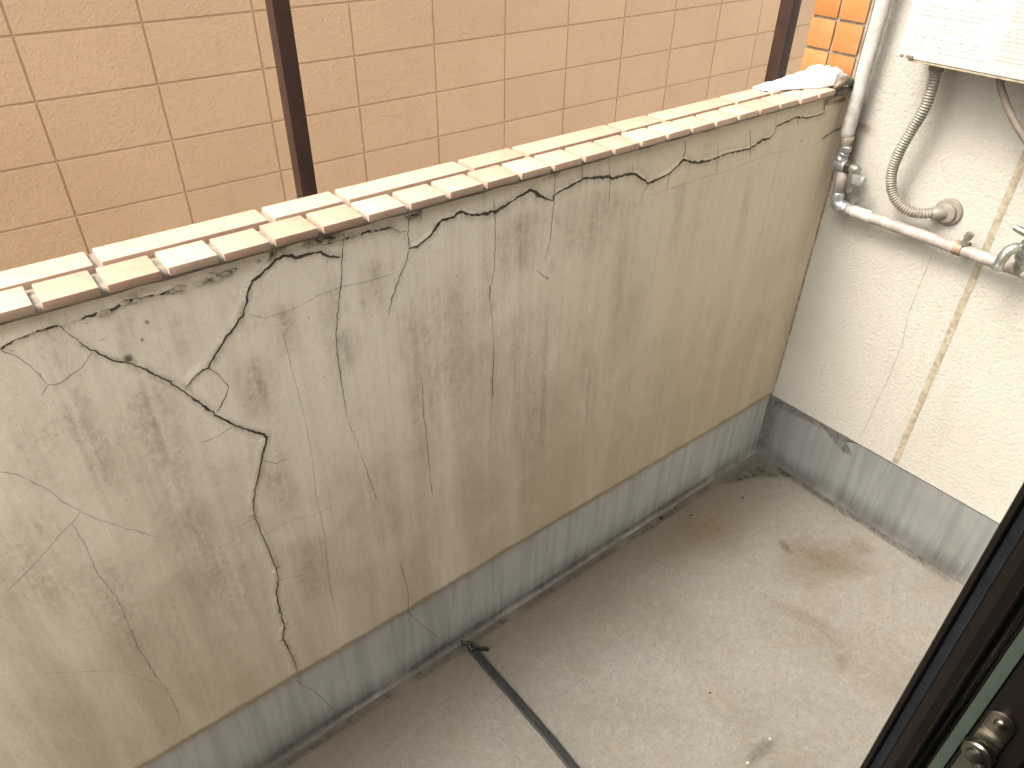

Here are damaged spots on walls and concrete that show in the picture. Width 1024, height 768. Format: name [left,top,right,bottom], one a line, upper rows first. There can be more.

crack [0,96,842,709]